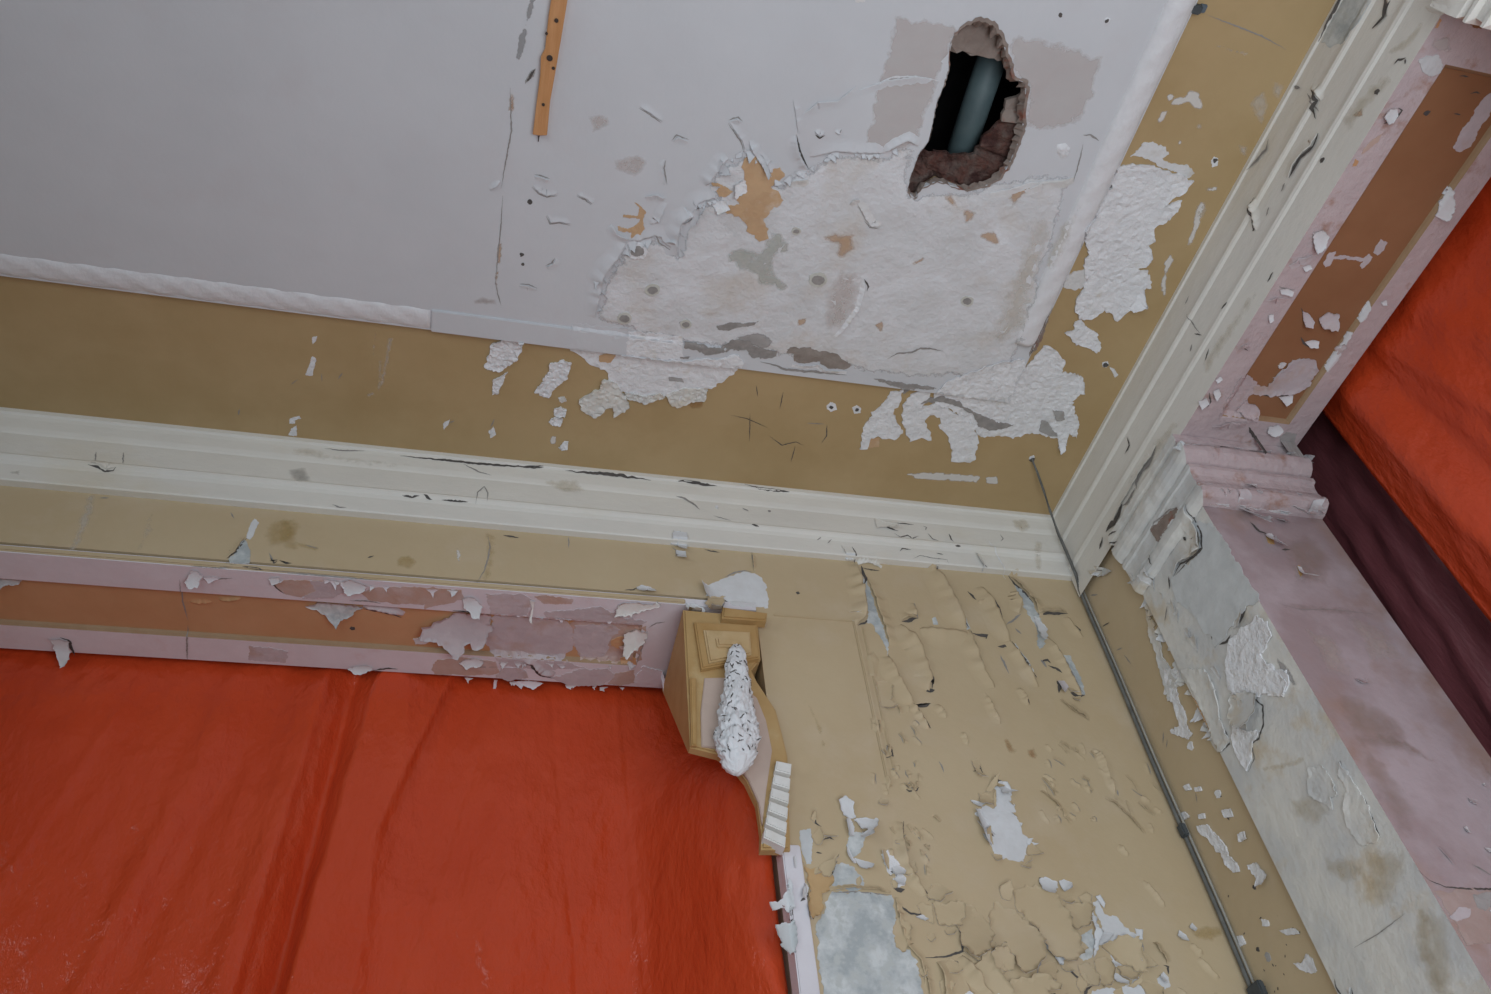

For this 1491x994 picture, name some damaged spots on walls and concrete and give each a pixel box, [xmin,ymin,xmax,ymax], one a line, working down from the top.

peeling [584,17,1067,377]
peeling [1435,186,1456,222]
spalling [579,379,708,418]
peeling [1129,289,1148,313]
peeling [1171,286,1388,463]
peeling [268,553,665,691]
peeling [686,553,769,612]
peeling [817,537,945,728]
peeling [1088,483,1326,772]
peeling [769,795,917,955]
peeling [892,759,1198,994]
peeling [1178,784,1266,890]